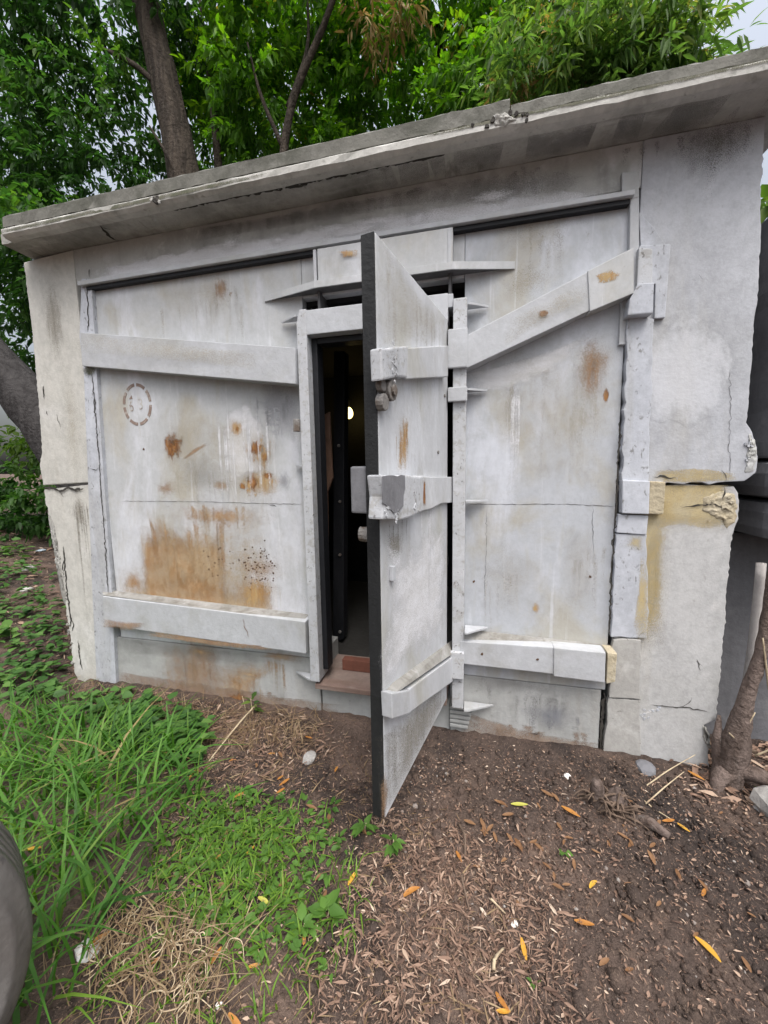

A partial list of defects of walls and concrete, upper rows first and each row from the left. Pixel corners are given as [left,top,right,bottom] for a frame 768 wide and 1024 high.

spalling [471,110,529,129]
crack [174,154,445,211]
corrosion [597,270,621,283]
crack [43,378,108,586]
corrosion [119,412,294,609]
corrosion [396,419,410,470]
spalling [685,488,738,528]
spalling [744,434,757,473]
damp [623,468,736,644]
crack [62,547,82,668]